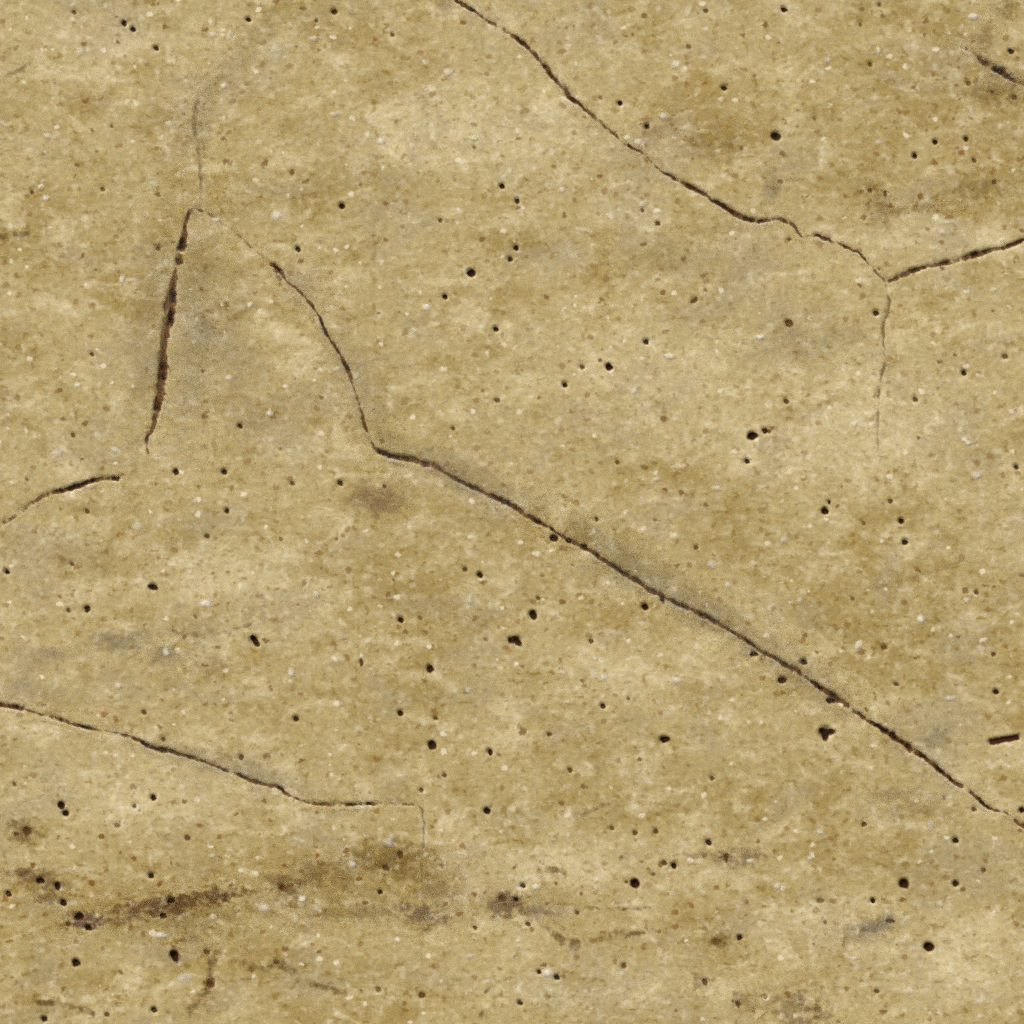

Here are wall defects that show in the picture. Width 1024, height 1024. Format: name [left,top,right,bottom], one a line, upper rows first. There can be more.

crack [454,0,1024,417]
crack [3,476,120,523]
crack [145,209,1024,828]
crack [0,703,425,833]